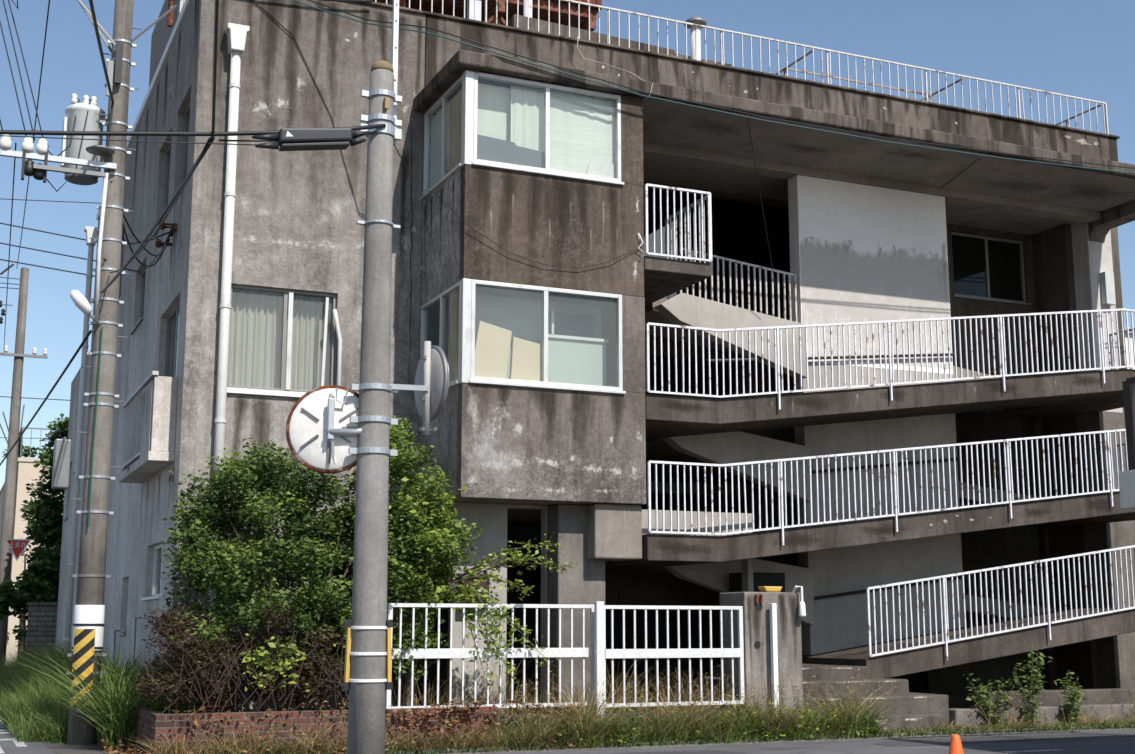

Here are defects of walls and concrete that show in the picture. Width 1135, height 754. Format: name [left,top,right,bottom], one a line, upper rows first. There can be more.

damp [267,0,299,96]
damp [362,9,386,54]
damp [800,237,951,368]
damp [537,391,555,428]
damp [613,396,622,423]